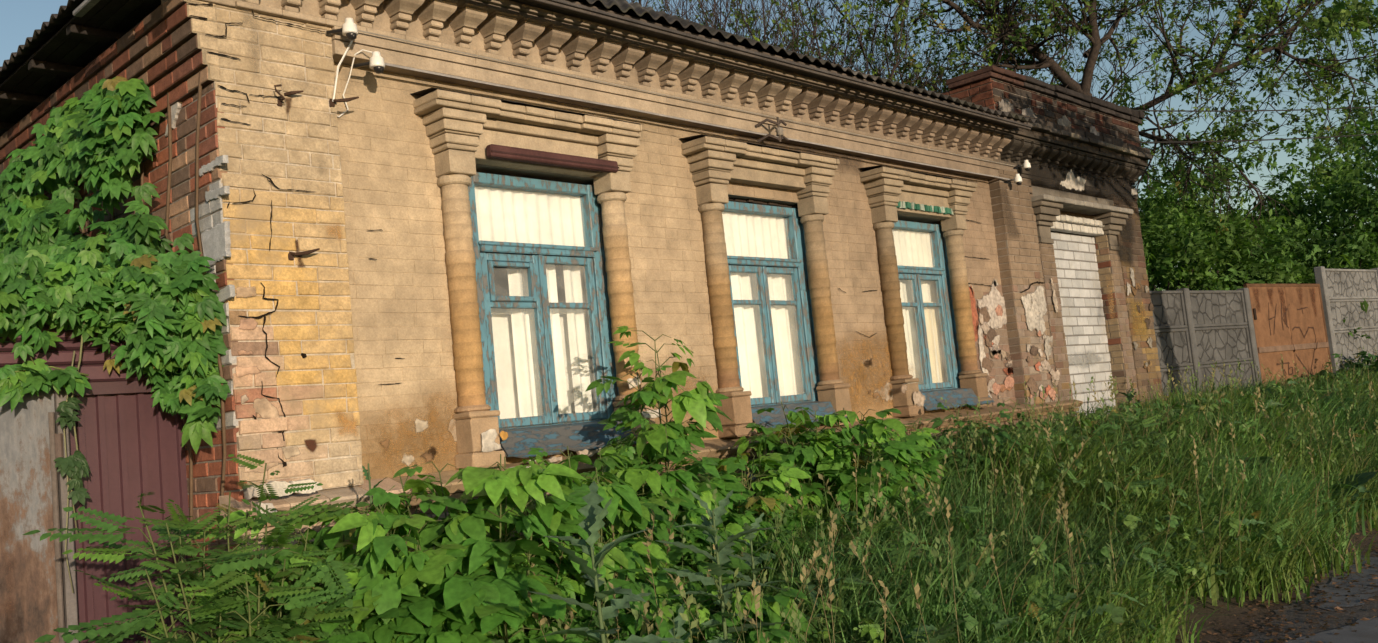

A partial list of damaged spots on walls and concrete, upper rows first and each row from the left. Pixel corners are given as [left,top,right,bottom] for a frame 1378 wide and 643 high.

peeling [199,155,230,202]
peeling [201,221,231,268]
crack [227,174,313,250]
flaking render [1060,170,1086,191]
crack [241,283,286,465]
flaking render [969,278,1060,401]